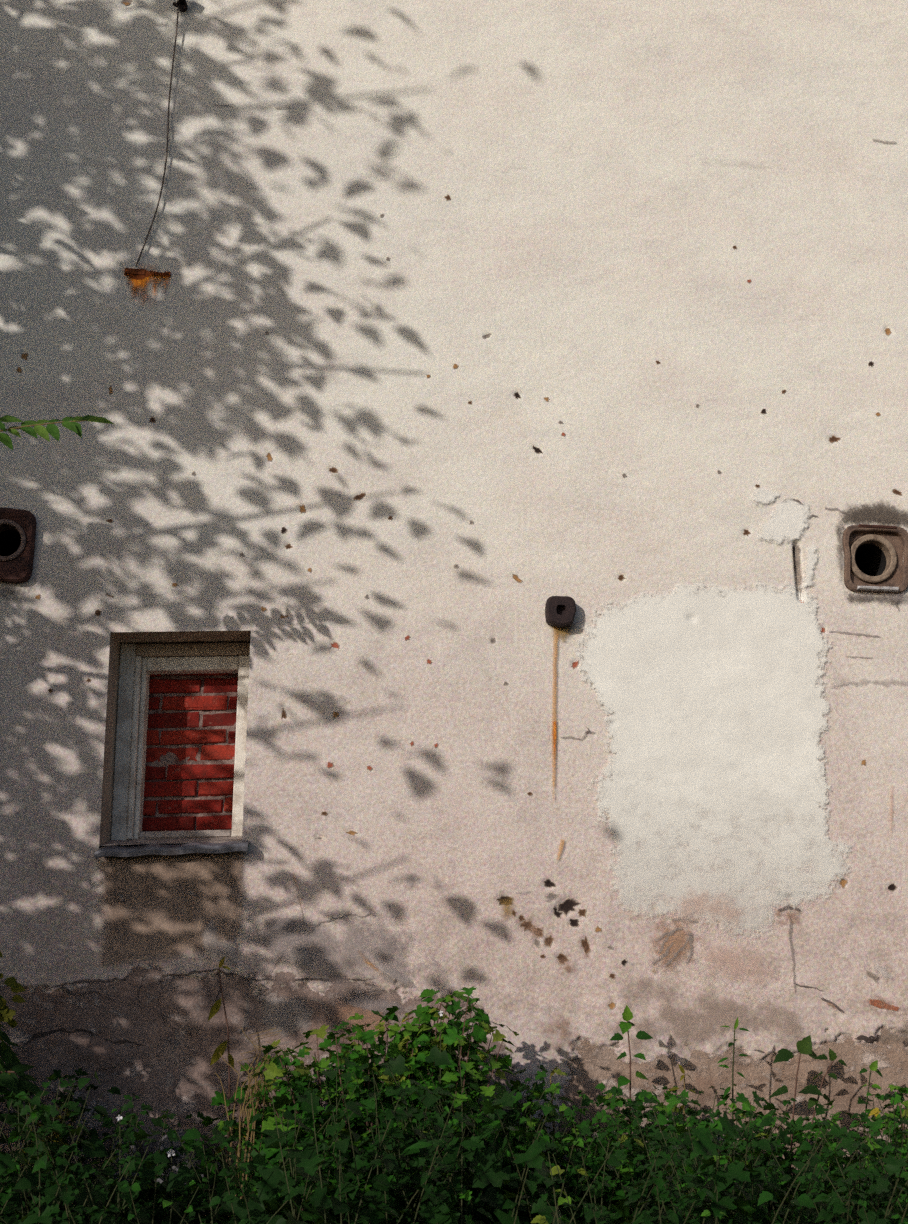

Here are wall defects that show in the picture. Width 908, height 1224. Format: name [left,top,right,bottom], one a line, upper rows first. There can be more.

corrosion [124,268,171,293]
corrosion [552,626,570,788]
damp [102,851,242,963]
damp [266,919,400,974]
spalling [496,895,570,972]
spalling [544,879,602,956]
spalling [869,999,899,1011]
peeling [0,965,533,1189]
peeling [558,1027,908,1175]